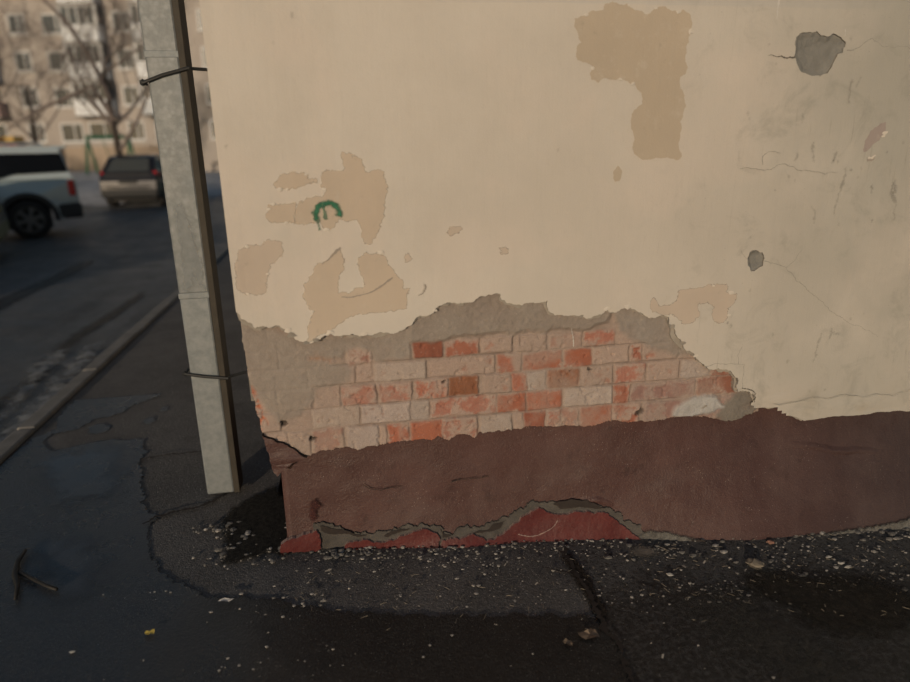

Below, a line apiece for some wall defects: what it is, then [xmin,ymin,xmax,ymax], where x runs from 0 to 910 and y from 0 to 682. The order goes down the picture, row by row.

peeling [574,1,693,160]
spalling [794,32,845,76]
spalling [235,152,771,456]
peeling [280,499,646,555]